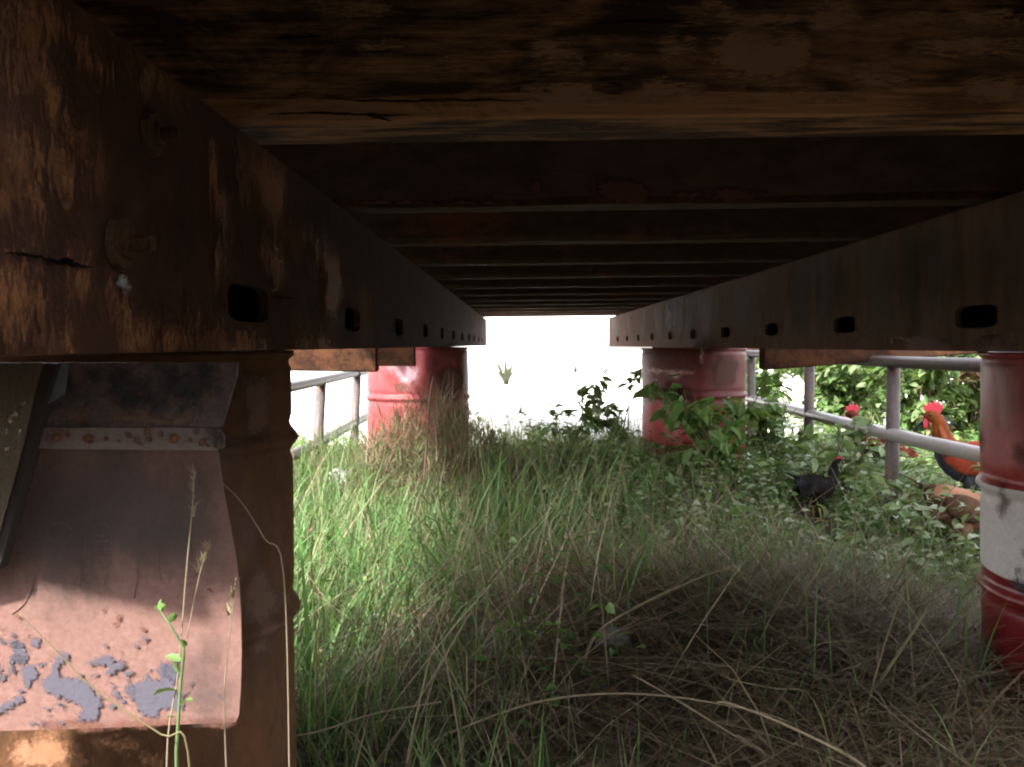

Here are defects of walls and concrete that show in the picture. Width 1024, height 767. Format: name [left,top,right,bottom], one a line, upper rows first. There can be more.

corrosion [2,0,108,208]
corrosion [0,257,74,354]
crack [5,252,95,269]
corrosion [105,279,267,352]
corrosion [293,327,334,349]
corrosion [303,228,343,323]
peeling [0,631,194,726]